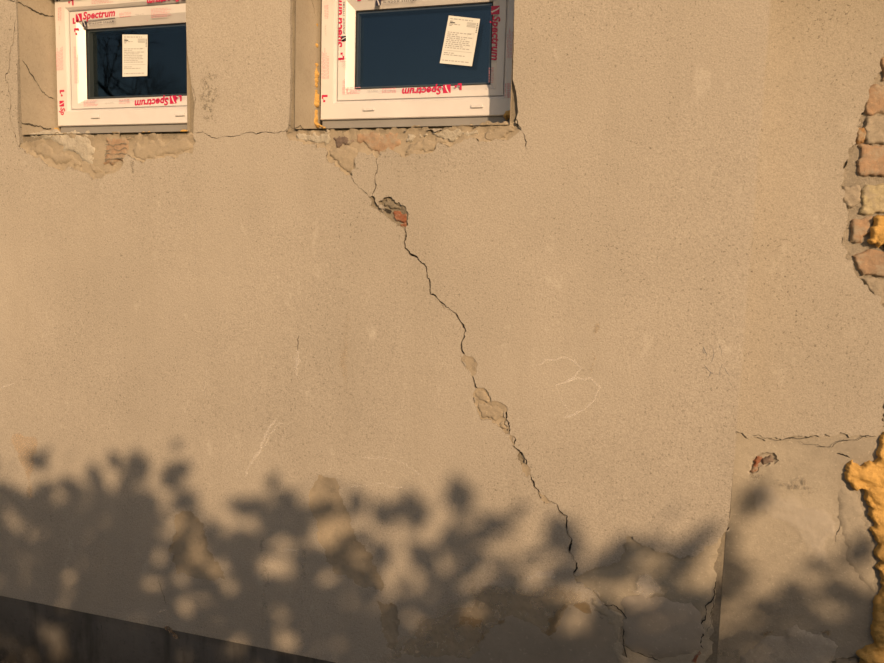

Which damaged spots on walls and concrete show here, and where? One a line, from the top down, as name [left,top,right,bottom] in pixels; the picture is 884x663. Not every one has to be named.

spalling [20,129,196,180]
spalling [287,121,521,176]
flaking render [841,53,884,306]
crack [405,232,466,354]
spalling [747,452,779,477]
crack [755,435,876,456]
flaking render [169,511,225,581]
flaking render [309,475,400,652]
crack [558,507,578,573]
spalling [574,536,726,663]